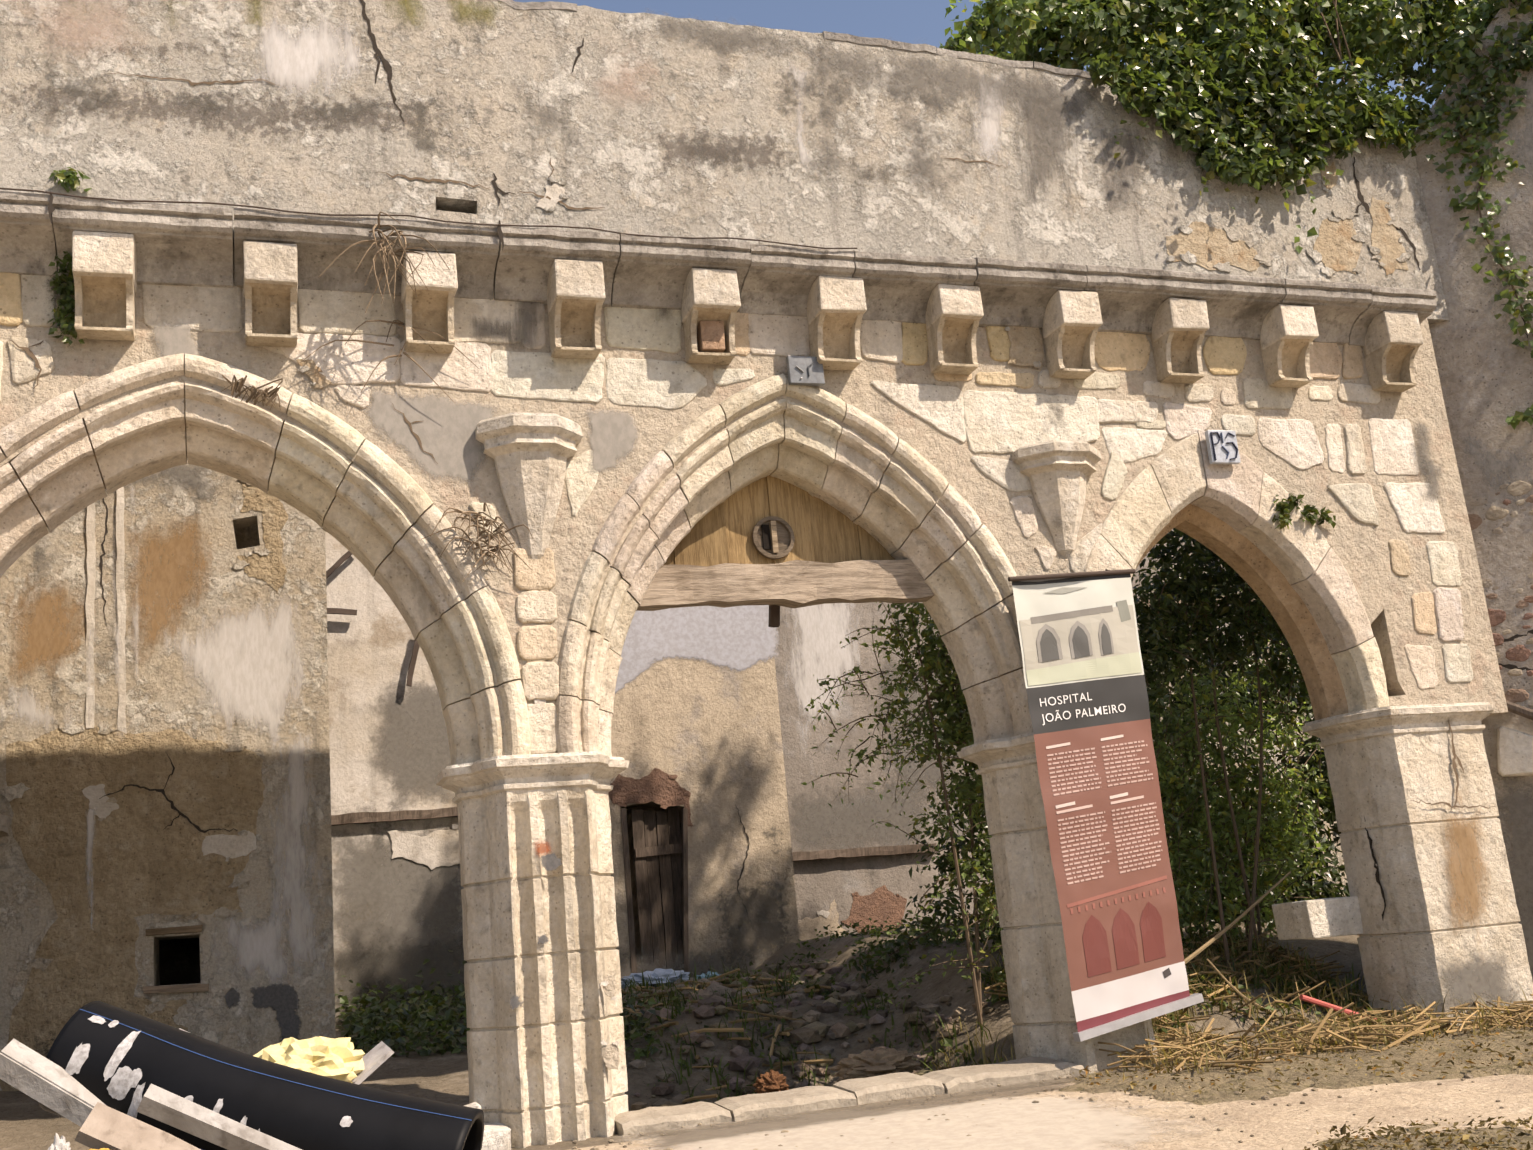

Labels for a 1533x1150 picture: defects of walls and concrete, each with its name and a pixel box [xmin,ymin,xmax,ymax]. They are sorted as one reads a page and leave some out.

leakage [2,22,444,152]
crack [360,0,405,122]
leakage [659,49,1093,182]
flaking render [1166,221,1274,272]
flaking render [1320,160,1338,193]
flaking render [1306,197,1411,277]
crack [1353,157,1421,270]
leakage [115,524,303,735]
crack [1411,720,1496,809]
flaking render [0,718,265,1058]
leakage [229,739,465,1023]
crack [1364,817,1386,919]